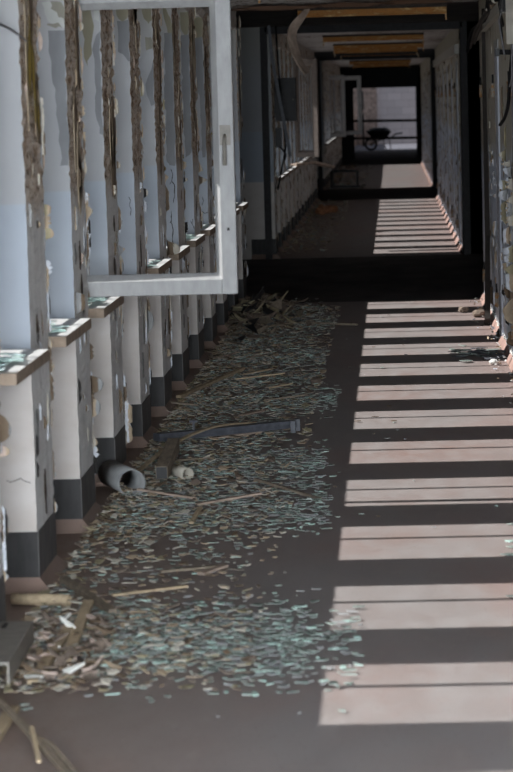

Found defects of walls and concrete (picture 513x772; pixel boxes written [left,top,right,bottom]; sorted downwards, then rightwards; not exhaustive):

peeling [20,0,217,316]
peeling [488,87,513,357]
peeling [0,403,11,458]
peeling [36,260,58,514]
peeling [78,370,103,474]
peeling [116,374,133,444]
peeling [139,296,154,392]
peeling [164,295,173,367]
peeling [182,295,205,337]
peeling [1,504,9,582]